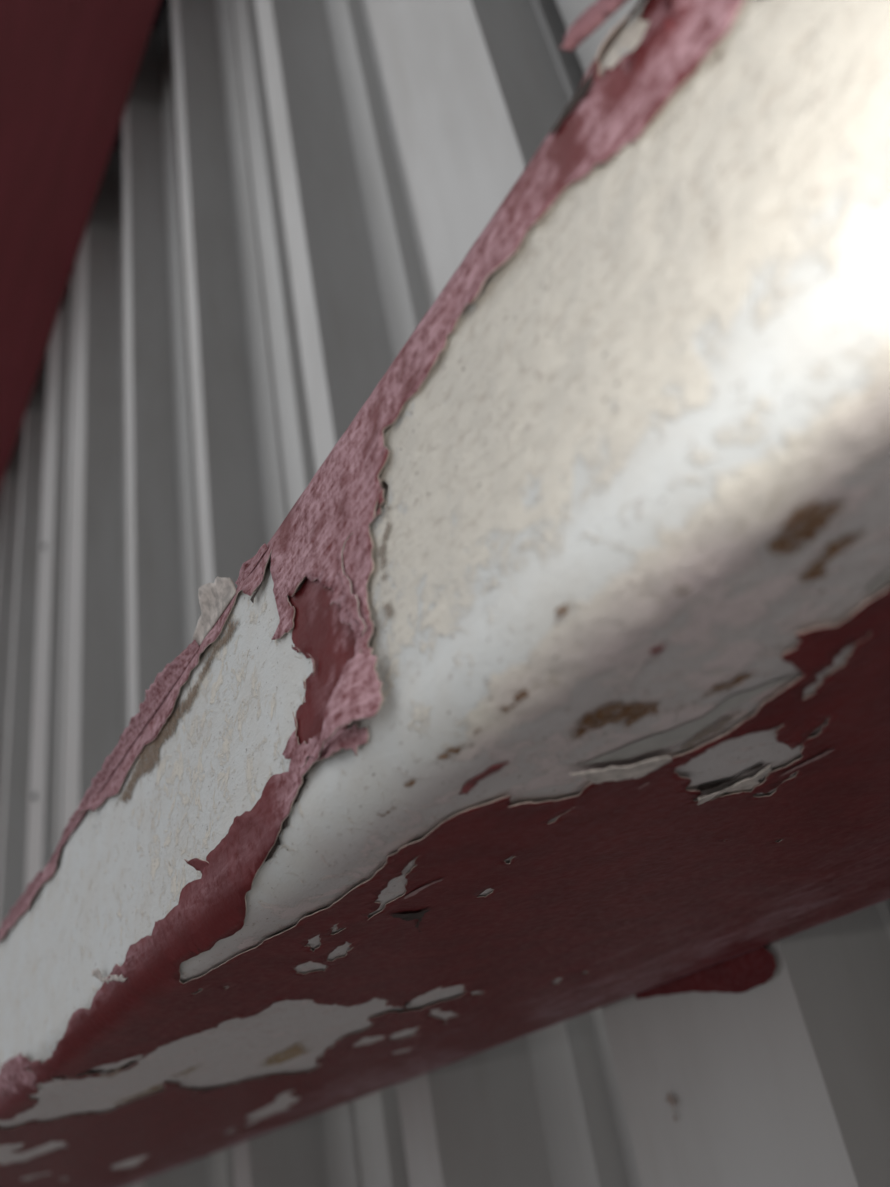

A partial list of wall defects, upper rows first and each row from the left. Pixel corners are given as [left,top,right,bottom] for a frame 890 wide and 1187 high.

peeling [180,0,890,983]
rust [767,502,842,555]
rust [800,530,866,582]
rust [566,673,766,742]
peeling [0,563,466,1128]
peeling [0,1141,68,1165]
peeling [111,1155,149,1170]